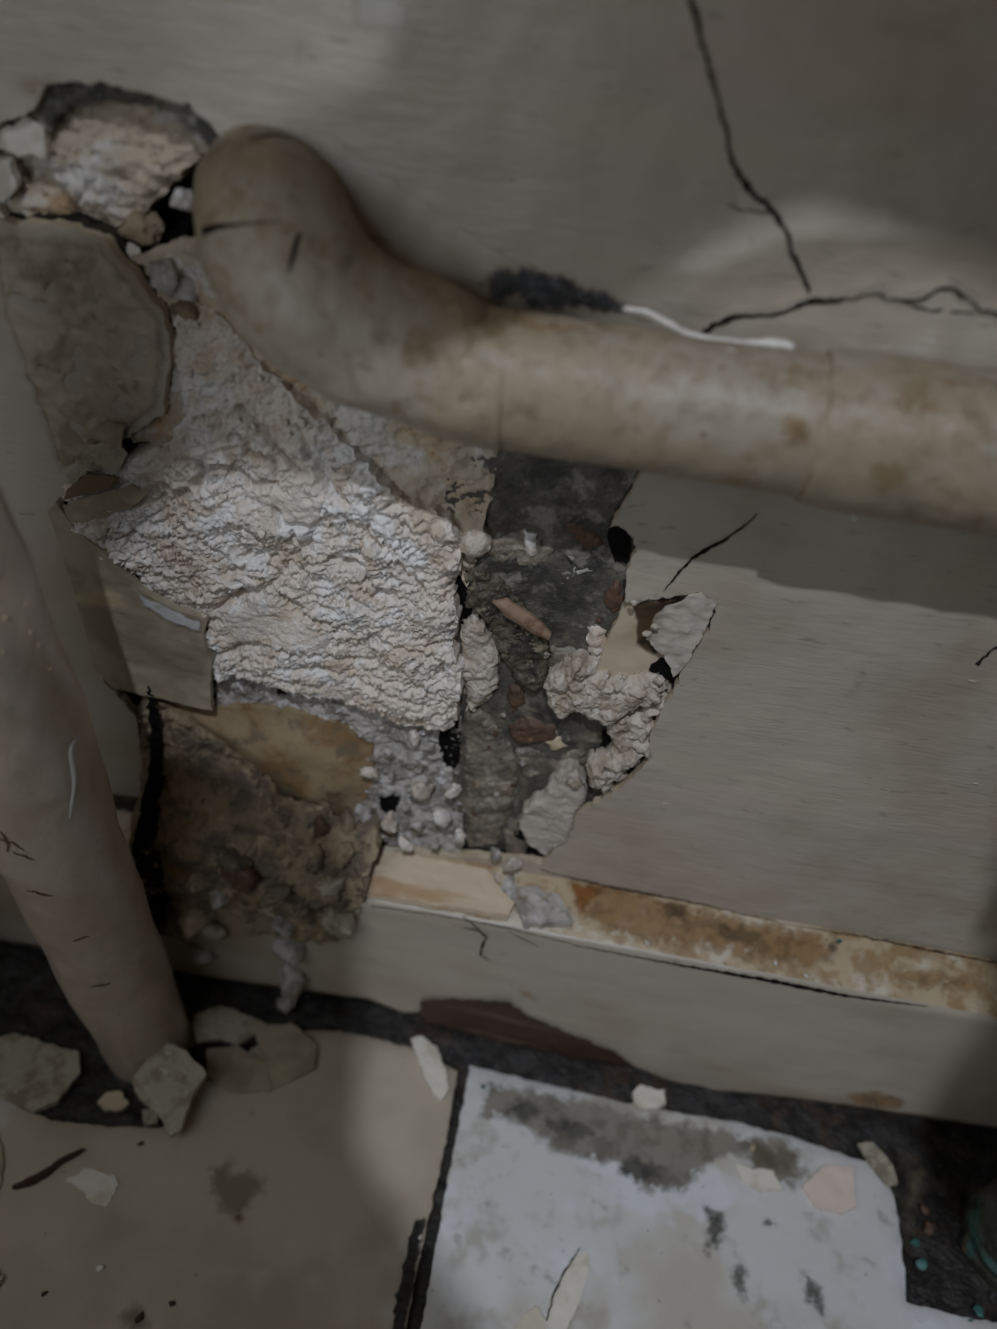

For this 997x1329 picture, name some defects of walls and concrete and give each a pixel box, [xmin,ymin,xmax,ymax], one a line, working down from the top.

crack [687,0,997,333]
spalling [0,81,717,872]
crack [664,513,757,591]
damp [484,1084,804,1190]